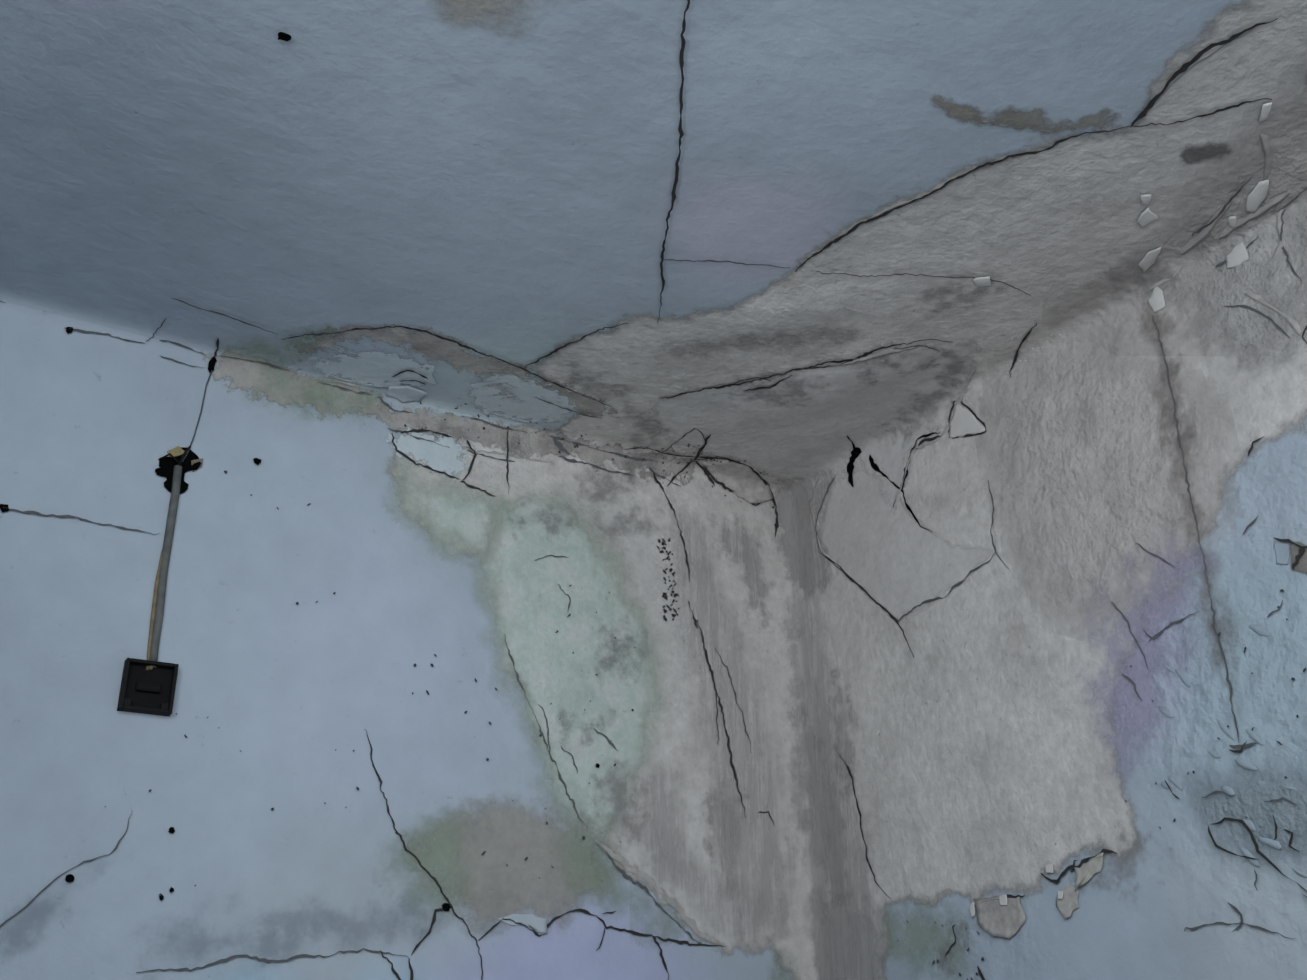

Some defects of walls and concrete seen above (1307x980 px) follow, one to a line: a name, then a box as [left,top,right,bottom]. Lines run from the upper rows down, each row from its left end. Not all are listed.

crack [65,0,1277,407]
crack [9,509,159,535]
peeling [212,348,693,481]
peeling [293,0,1307,980]
leakage [399,483,658,836]
crack [0,815,131,927]
crack [136,735,724,980]
leakage [789,608,880,980]
crack [1165,781,1307,939]